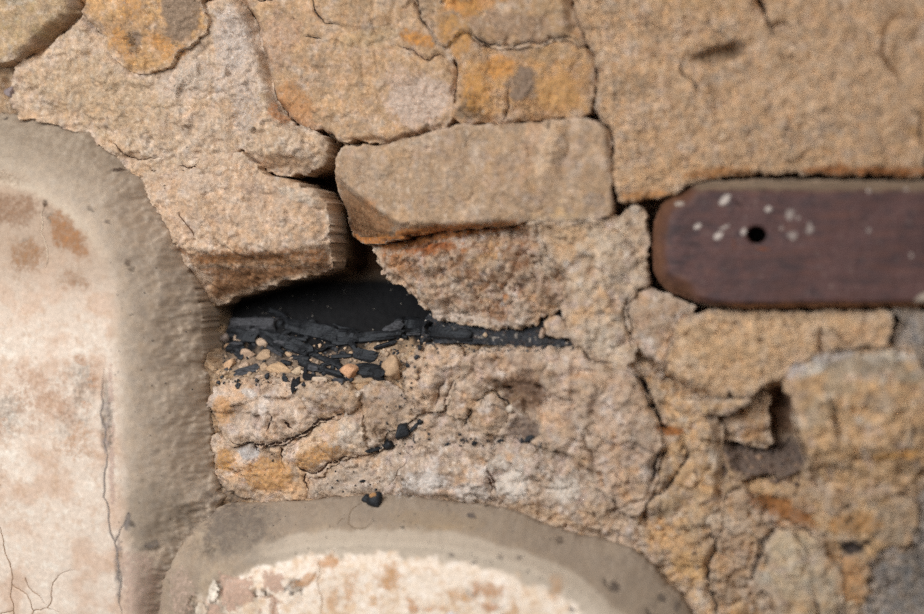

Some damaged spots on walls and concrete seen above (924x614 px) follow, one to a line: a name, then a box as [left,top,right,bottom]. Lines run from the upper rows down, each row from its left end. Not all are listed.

spalling [336,180,567,332]
crack [0,528,72,614]
crack [100,378,127,614]
crack [231,412,350,490]